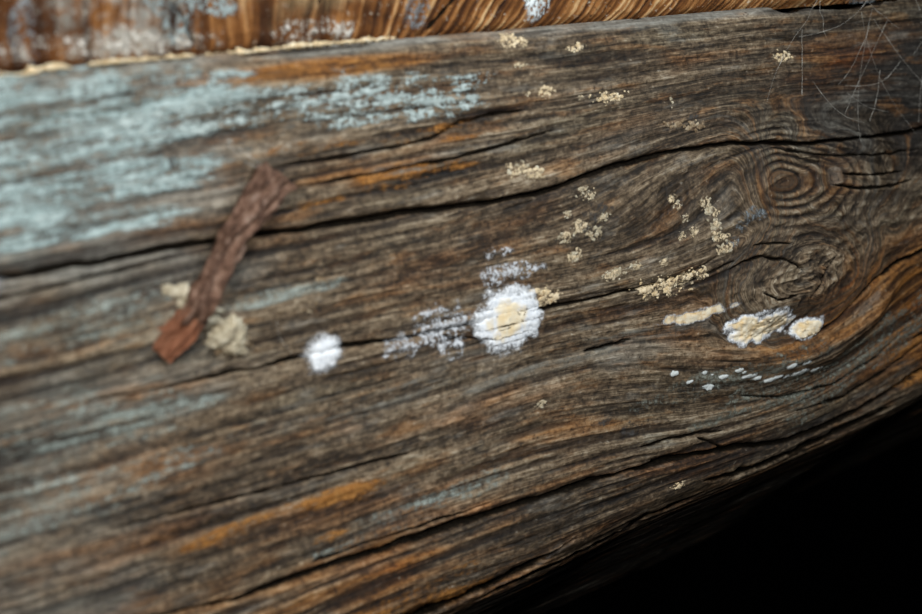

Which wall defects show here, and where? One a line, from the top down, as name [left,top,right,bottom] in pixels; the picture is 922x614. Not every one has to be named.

crack [252,127,922,237]
crack [0,238,216,300]
damp [237,286,305,308]
crack [338,321,480,348]
mould [384,247,544,360]
crack [538,242,837,311]
damp [663,294,922,430]
crack [94,332,922,614]